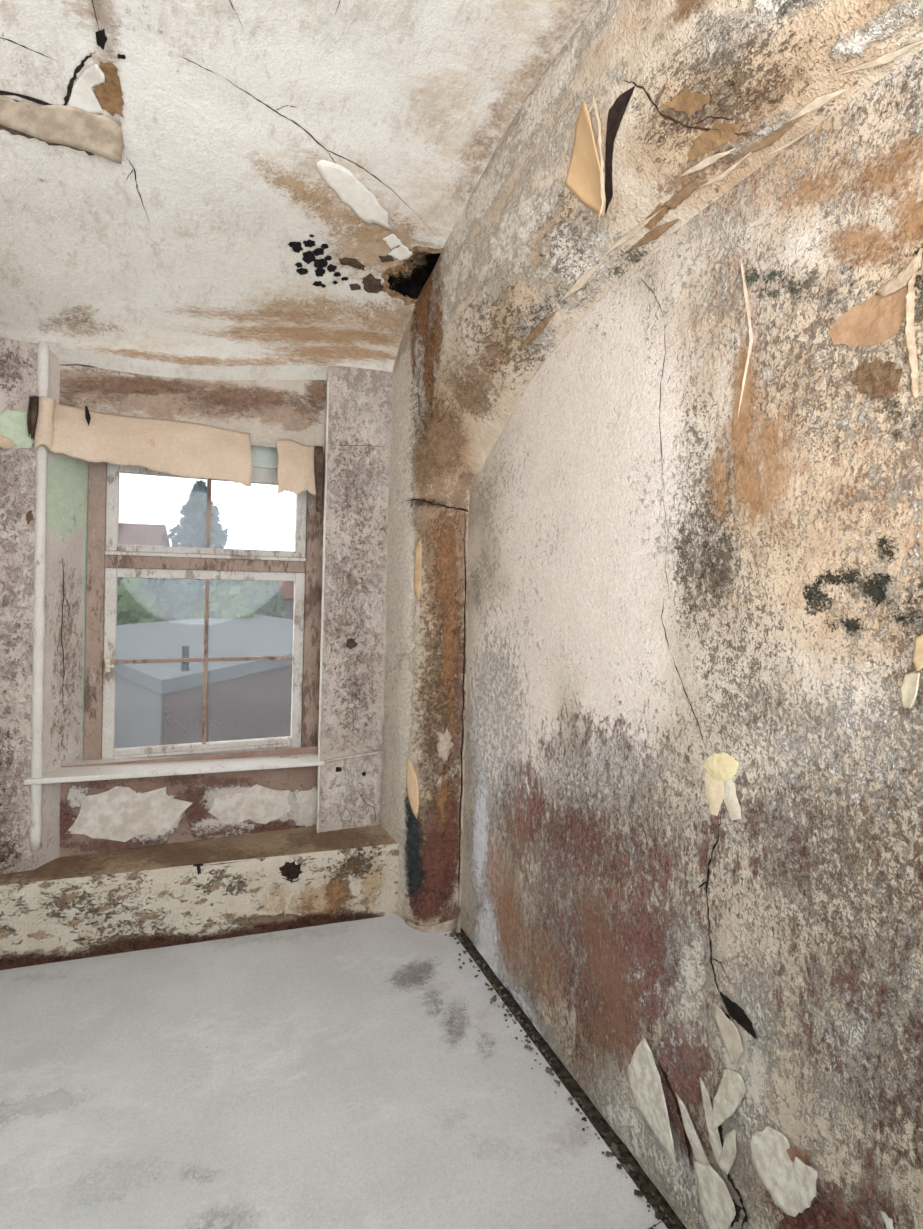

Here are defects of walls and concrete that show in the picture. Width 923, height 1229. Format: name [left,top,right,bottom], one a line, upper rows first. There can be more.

flaking render [0,29,126,164]
crack [178,55,428,227]
crack [624,80,758,136]
damp [261,169,414,333]
damp [671,342,795,629]
corrosion [418,508,461,758]
damp [800,534,923,638]
peeling [65,786,192,842]
peeling [208,784,317,824]
damp [472,751,562,1063]
crack [698,813,728,995]
peeling [628,1004,818,1229]